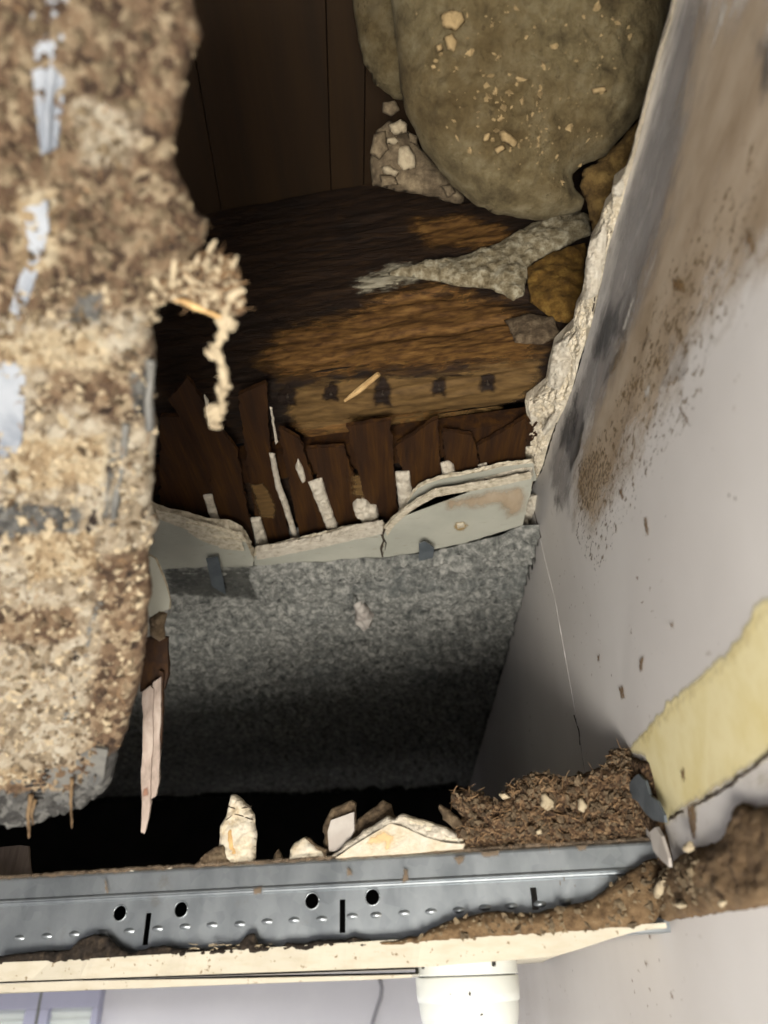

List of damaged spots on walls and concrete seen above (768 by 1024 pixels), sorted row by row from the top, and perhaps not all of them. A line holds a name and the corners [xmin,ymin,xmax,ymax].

damp [553,0,768,563]
spalling [521,493,537,526]
spalling [167,568,258,600]
peeling [346,593,374,631]